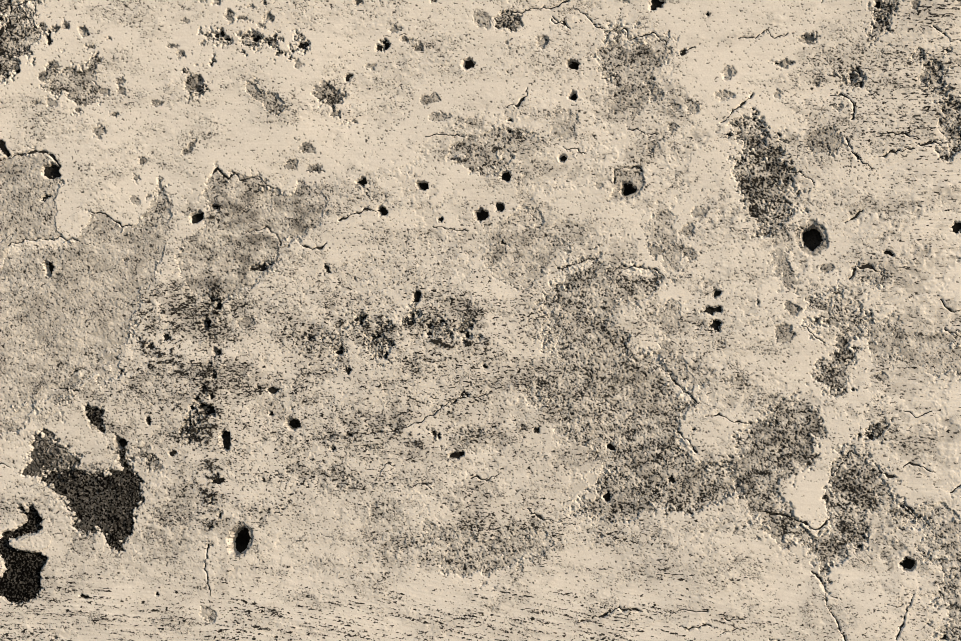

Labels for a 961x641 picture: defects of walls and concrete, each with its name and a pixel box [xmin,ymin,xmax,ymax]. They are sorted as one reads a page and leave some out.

flaking render [0,0,126,114]
peeling [167,44,210,100]
spalling [198,0,311,69]
flaking render [246,78,288,115]
crack [502,0,696,56]
flaking render [176,141,328,309]
flaking render [0,139,173,438]
spalling [180,362,217,449]
flaking render [252,383,293,421]
flaking render [22,428,177,552]
crack [903,462,936,473]
flaking render [0,505,52,603]